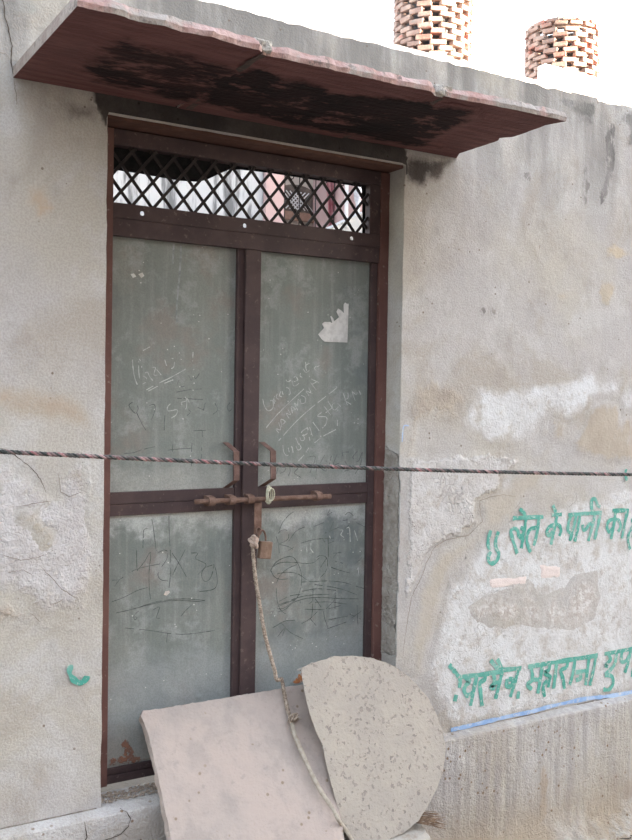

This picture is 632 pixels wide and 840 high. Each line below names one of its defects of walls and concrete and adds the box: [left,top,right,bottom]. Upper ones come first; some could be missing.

crack [0,0,17,104]
water stain [551,91,632,214]
crack [0,448,78,507]
crack [0,554,77,604]
peeling [0,446,103,642]
peeling [381,441,524,658]
peeling [421,484,632,733]
rust [107,736,151,768]